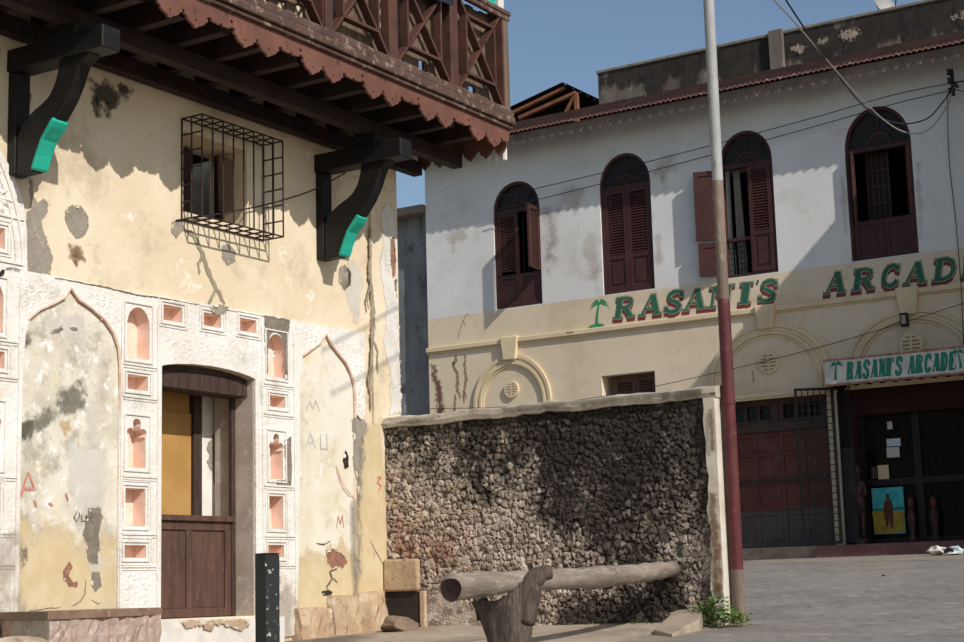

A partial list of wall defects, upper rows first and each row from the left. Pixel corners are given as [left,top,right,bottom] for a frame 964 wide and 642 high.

peeling [790,27,862,54]
peeling [26,182,53,275]
peeling [65,204,89,239]
crack [55,224,238,313]
peeling [380,202,402,415]
crack [452,314,468,411]
peeling [63,562,78,588]
peeling [83,507,103,592]
peeling [326,548,347,568]